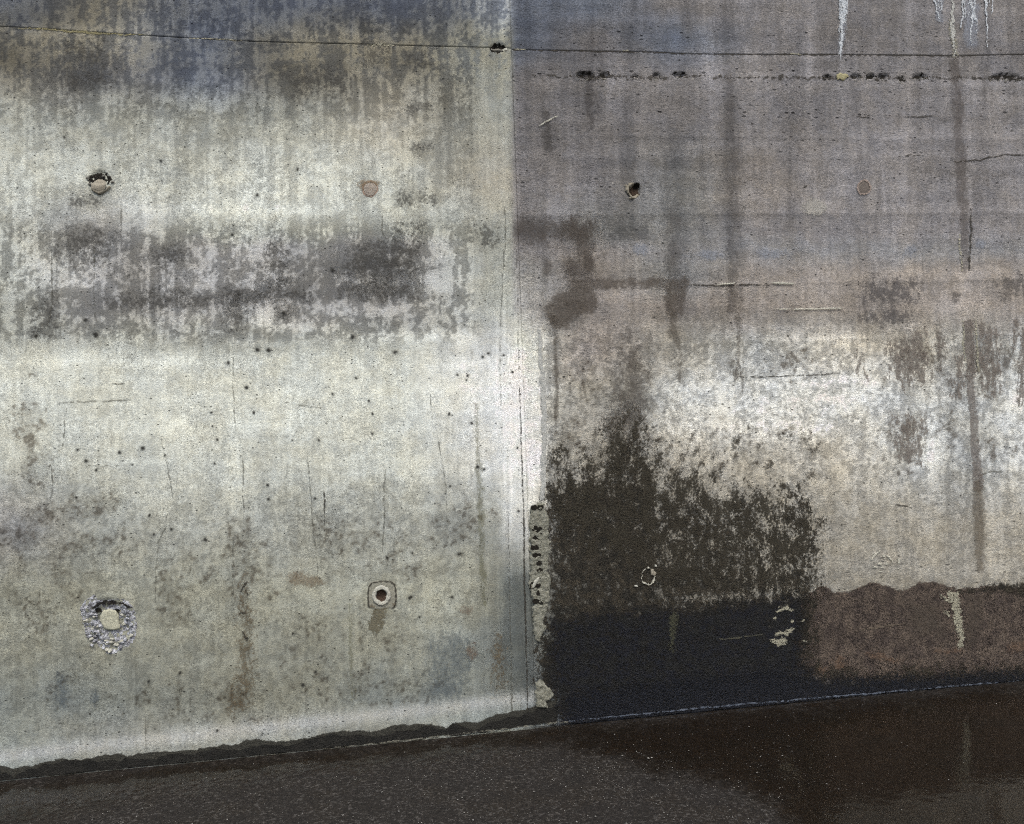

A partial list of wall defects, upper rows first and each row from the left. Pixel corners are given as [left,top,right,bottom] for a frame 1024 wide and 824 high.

damp [838,0,848,59]
damp [933,0,994,57]
crack [955,154,1023,162]
damp [546,278,688,326]
damp [0,405,1024,781]